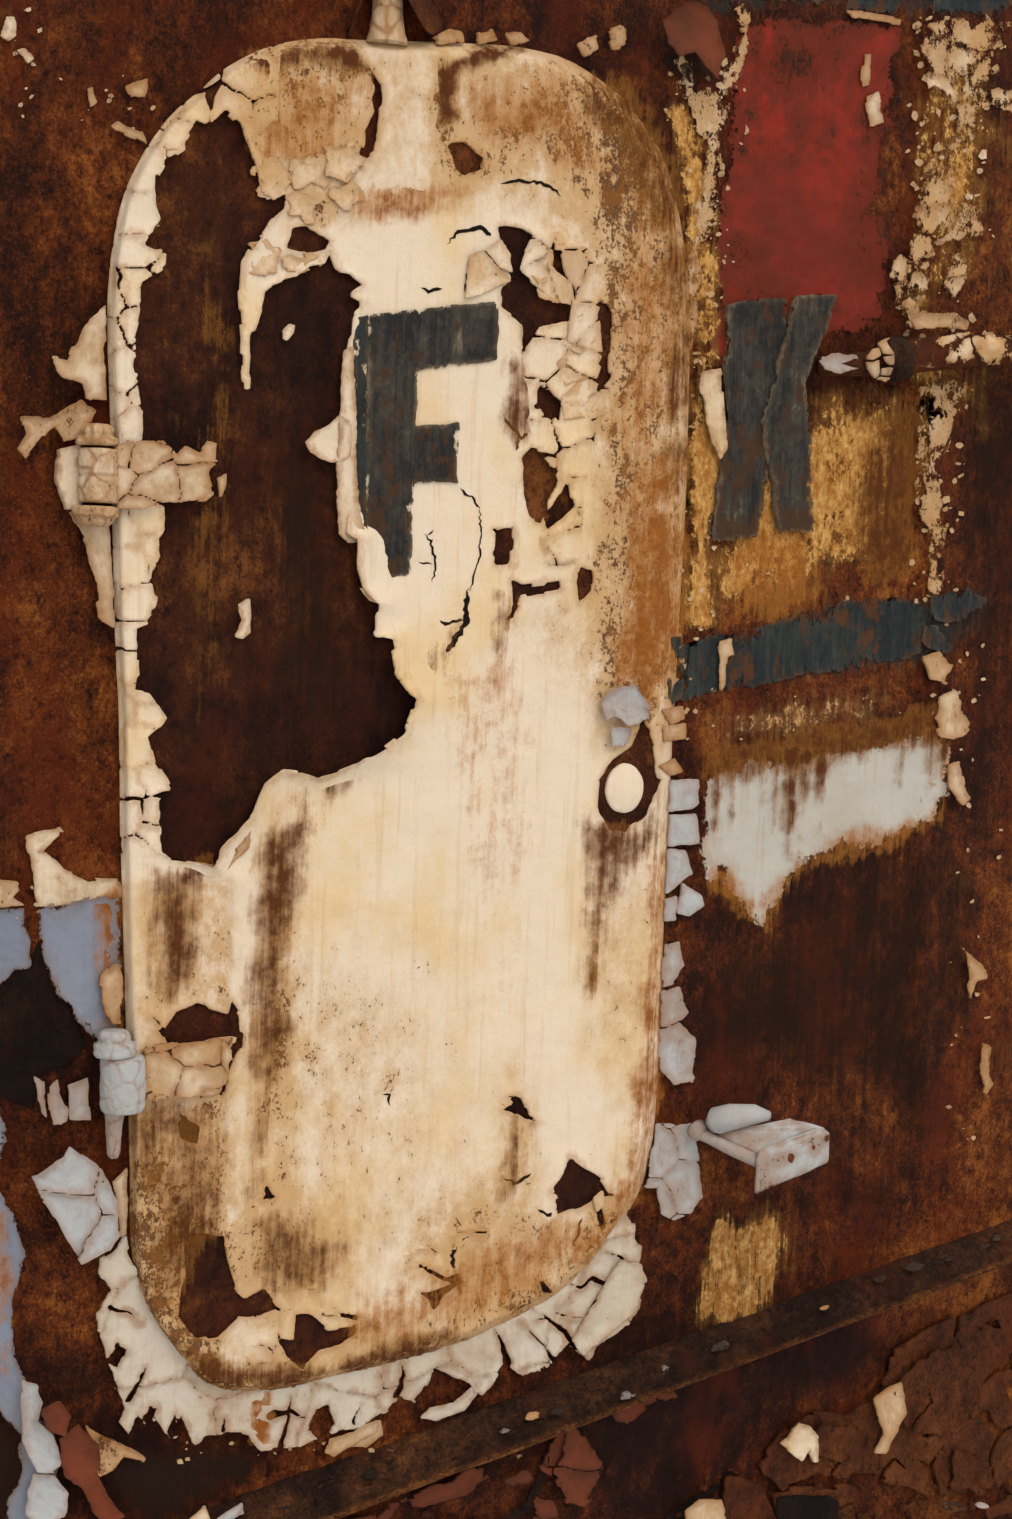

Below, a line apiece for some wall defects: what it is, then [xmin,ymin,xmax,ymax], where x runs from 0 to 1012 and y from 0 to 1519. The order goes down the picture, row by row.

rust [248,41,368,157]
peeling [465,226,612,423]
peeling [130,73,416,869]
crack [419,489,482,652]
peeling [522,448,574,529]
peeling [598,0,1012,927]
rust [711,705,949,851]
peeling [154,1002,243,1095]
rust [247,805,307,1101]
rust [585,815,665,992]
rust [184,948,661,1443]
peeling [0,1146,647,1519]